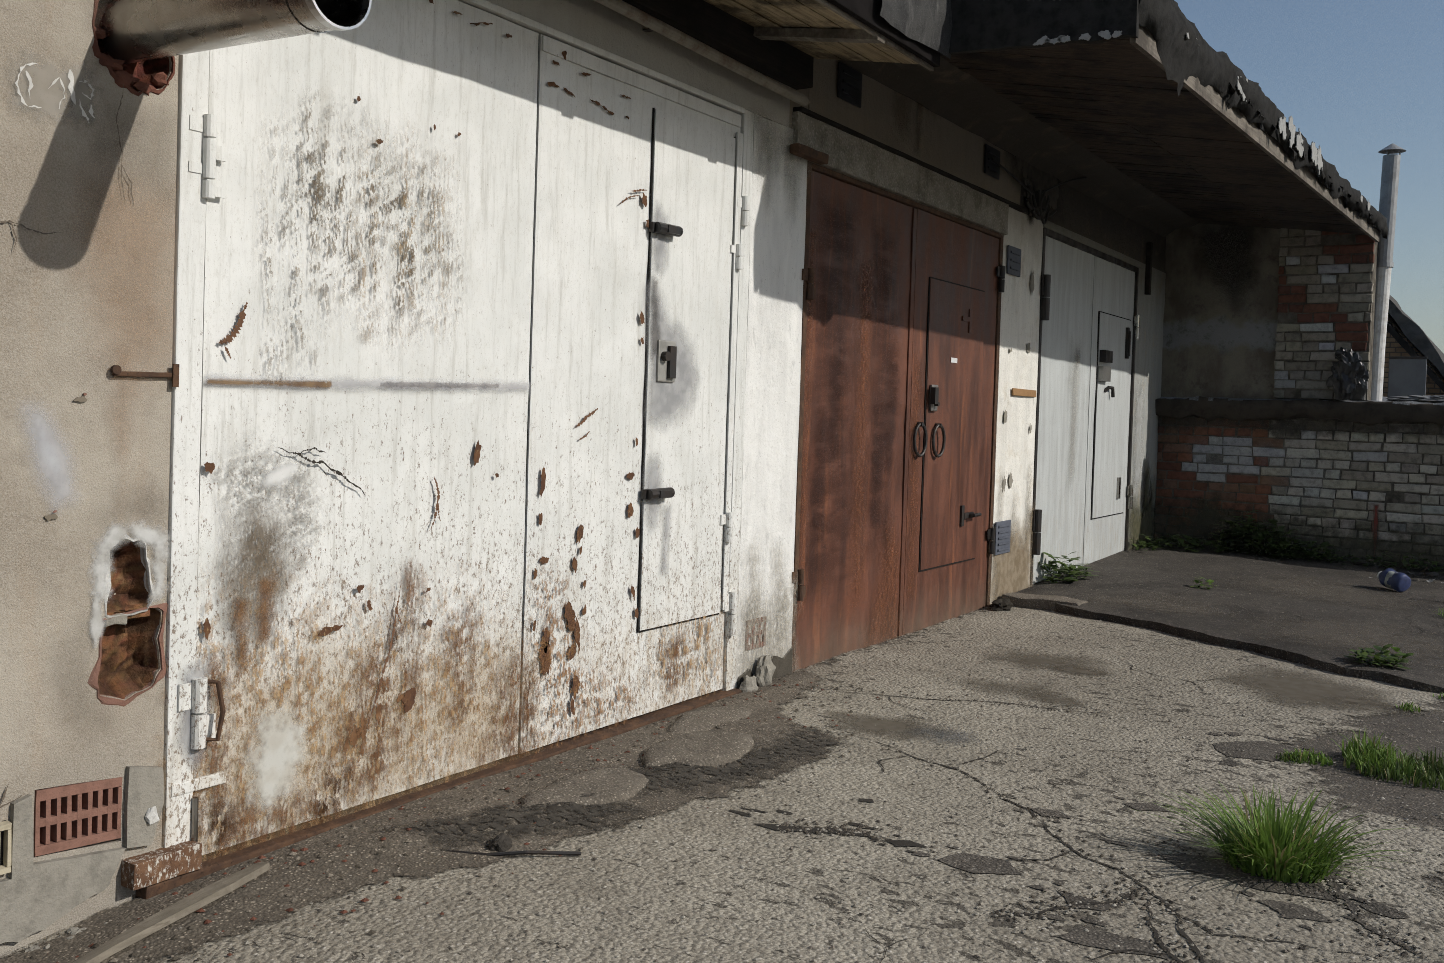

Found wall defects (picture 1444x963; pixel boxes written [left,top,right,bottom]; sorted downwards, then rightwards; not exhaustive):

peeling [15,63,95,120]
spalling [92,0,175,97]
water stain [650,209,696,418]
spalling [87,524,168,707]
water stain [227,457,319,666]
crack [278,447,365,495]
rust [193,568,636,855]
rust [656,616,720,691]
crack [801,727,1420,963]